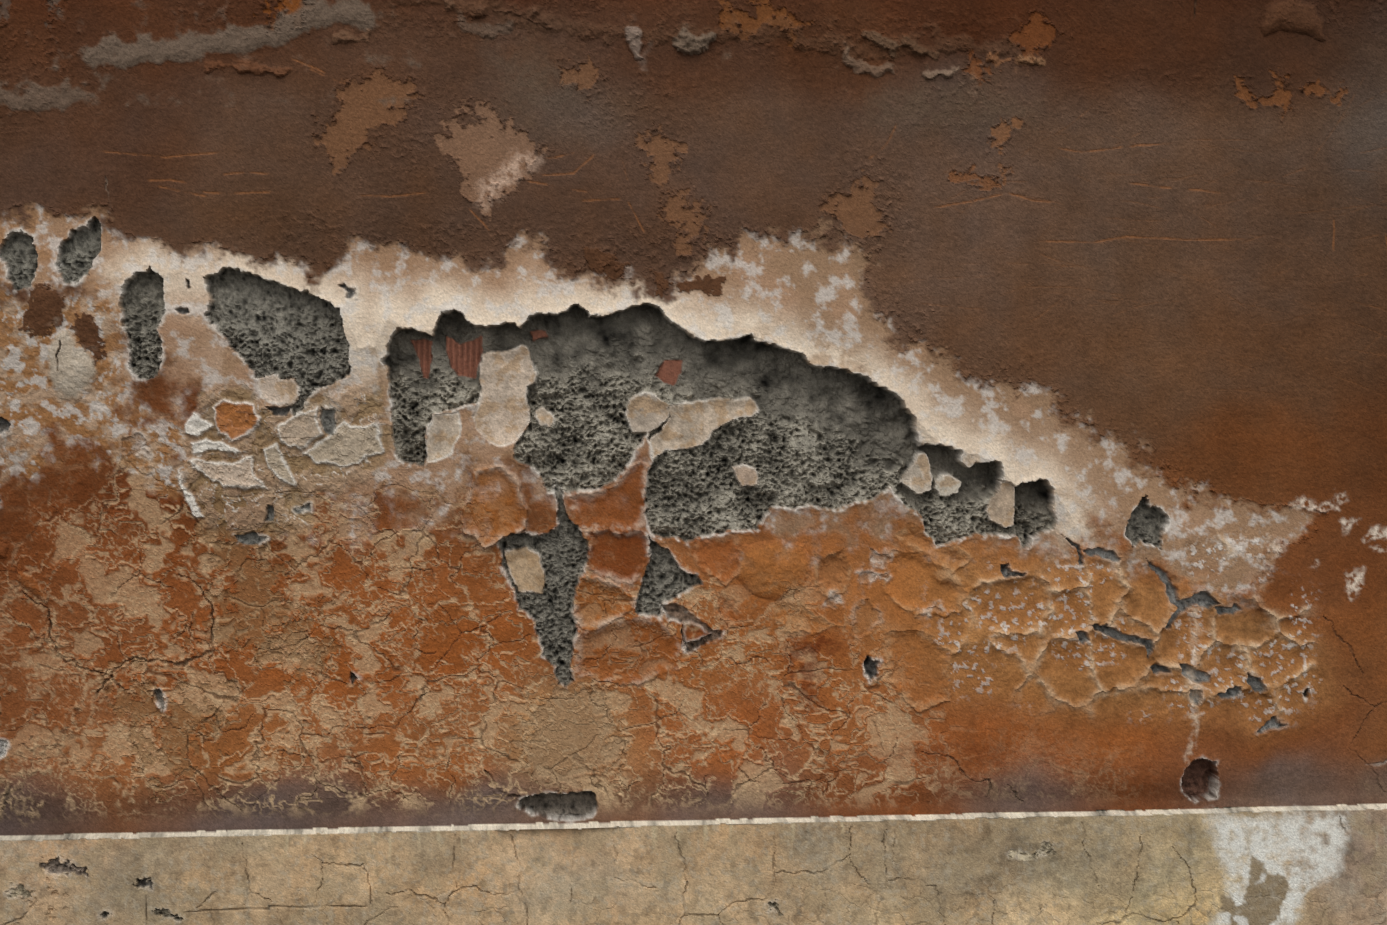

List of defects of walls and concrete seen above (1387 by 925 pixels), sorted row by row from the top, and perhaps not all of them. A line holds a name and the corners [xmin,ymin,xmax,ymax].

peeling [314,69,419,177]
peeling [434,101,545,213]
peeling [0,176,1314,686]
leakage [1290,494,1387,553]
leakage [1346,566,1366,597]
spalling [499,480,625,821]
crack [166,598,506,914]
crack [486,771,521,799]
spalling [1181,758,1219,803]
crack [679,827,897,925]
crack [1090,835,1198,925]
leakage [1181,807,1352,925]